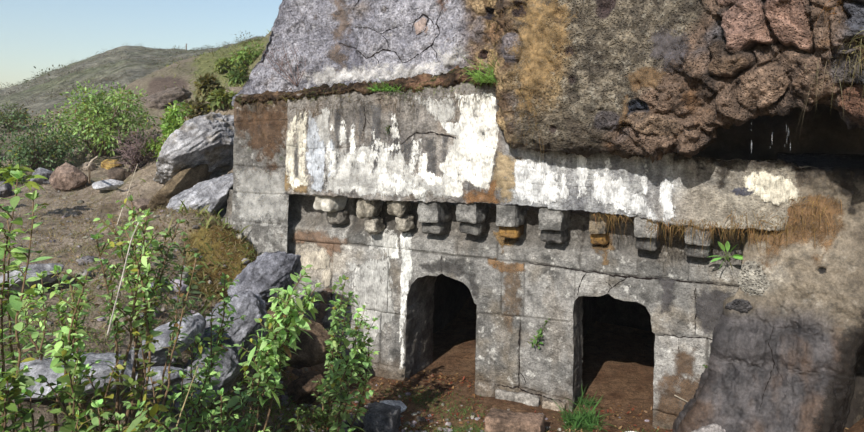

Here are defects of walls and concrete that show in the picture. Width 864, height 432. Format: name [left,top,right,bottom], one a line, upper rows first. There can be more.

crack [340,0,442,67]
flaking render [285,93,499,199]
crack [402,131,458,153]
crack [531,263,739,352]
crack [759,322,784,412]